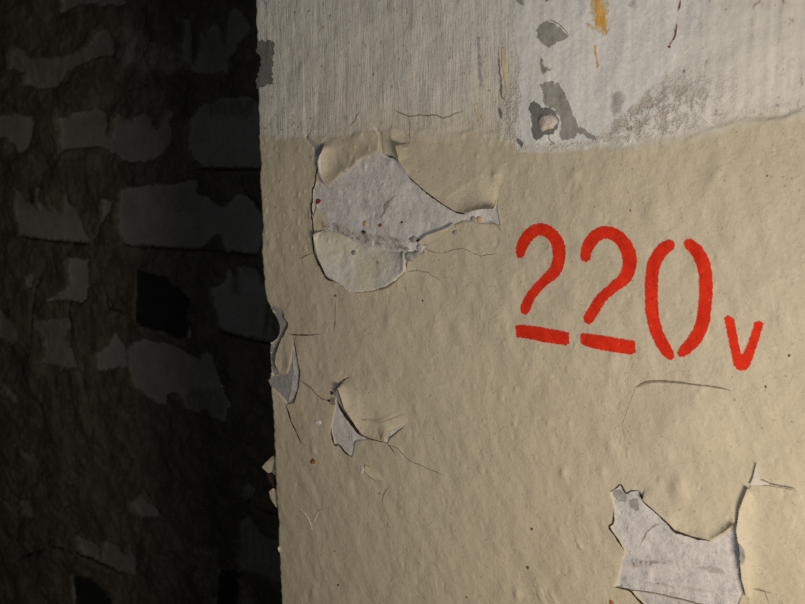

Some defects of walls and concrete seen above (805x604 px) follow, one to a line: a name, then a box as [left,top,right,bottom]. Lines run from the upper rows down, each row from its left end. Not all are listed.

spalling [536,20,568,48]
spalling [529,59,596,144]
corrosion [586,0,610,34]
peeling [302,111,502,293]
peeling [268,306,440,474]
peeling [609,462,793,604]